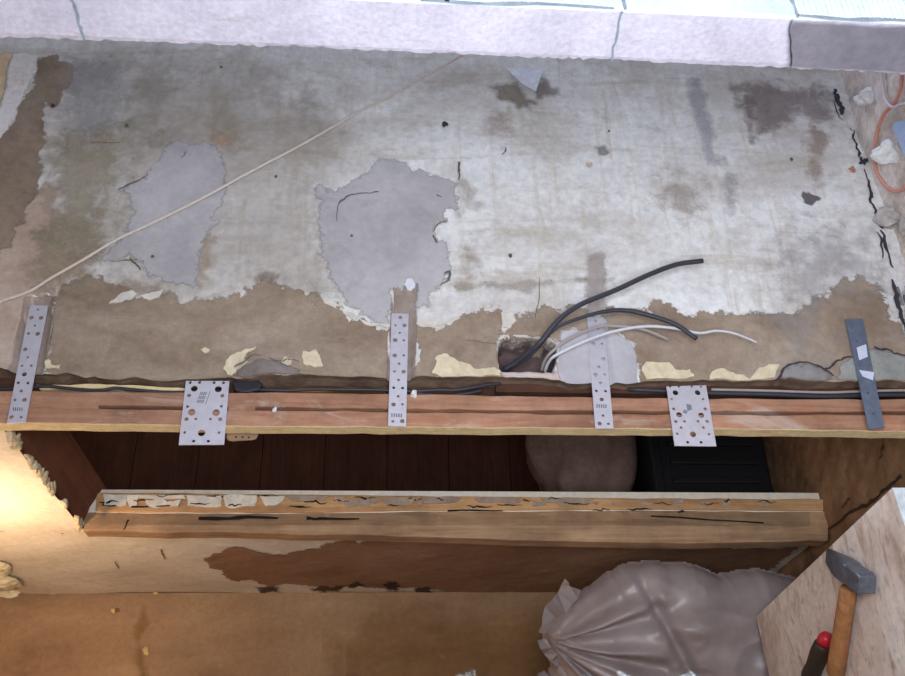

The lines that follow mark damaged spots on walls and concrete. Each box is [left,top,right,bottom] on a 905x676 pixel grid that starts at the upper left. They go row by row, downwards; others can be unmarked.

leakage [789,23,905,72]
leakage [494,80,556,107]
leakage [741,85,832,131]
peeling [0,52,75,249]
crack [832,89,905,327]
peeling [44,139,905,385]
peeling [103,494,462,509]
peeling [474,497,599,507]
crack [828,474,902,530]